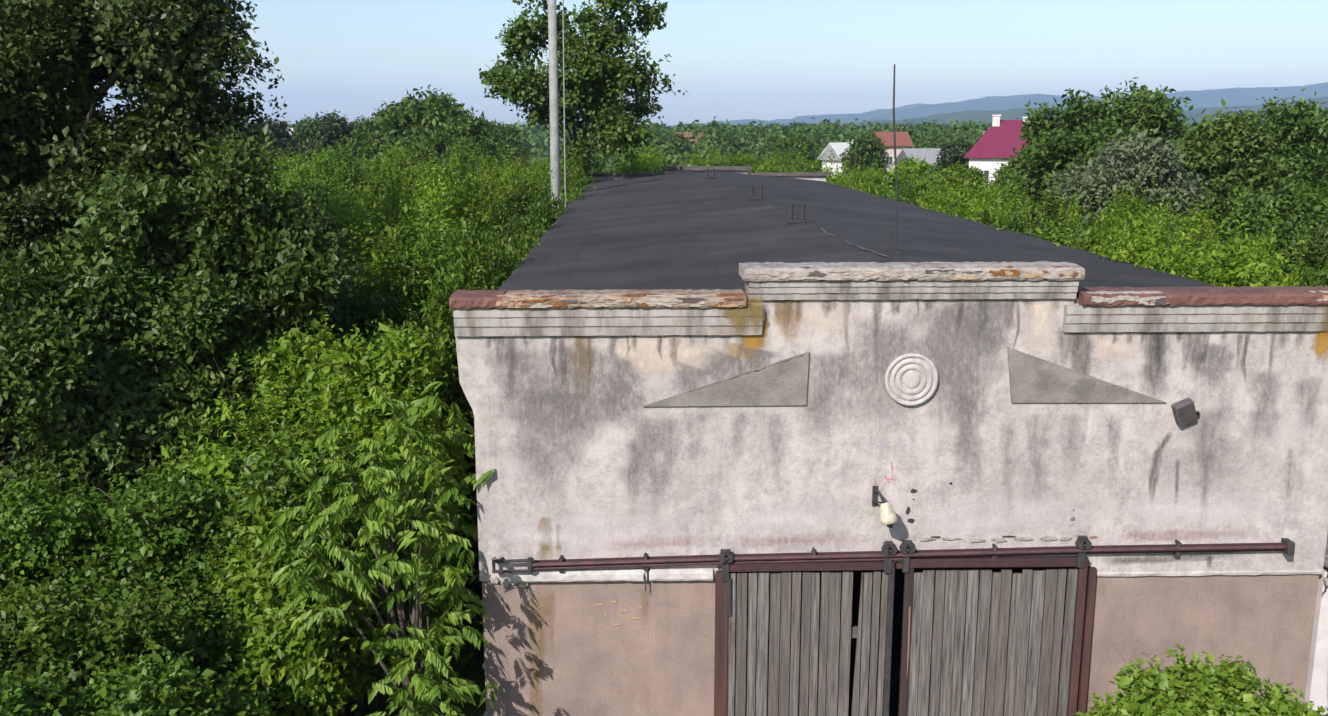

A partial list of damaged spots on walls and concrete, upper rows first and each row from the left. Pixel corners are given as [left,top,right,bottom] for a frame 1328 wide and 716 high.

peeling [496,293,744,308]
rust [727,298,792,359]
leakage [1145,332,1248,384]
rust [1316,308,1328,357]
leakage [488,336,642,474]
leakage [1144,435,1237,516]